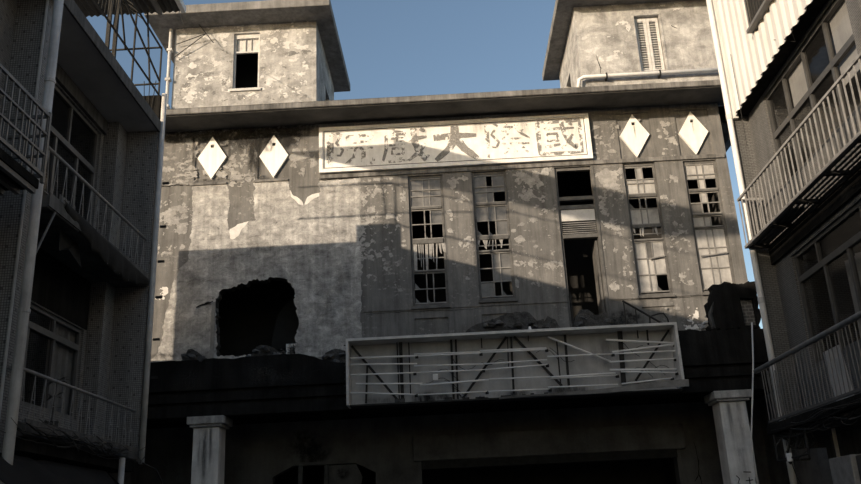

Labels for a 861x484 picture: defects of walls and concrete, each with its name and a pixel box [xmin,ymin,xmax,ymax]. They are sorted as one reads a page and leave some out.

peeling [174,22,309,103]
damp [164,125,313,178]
peeling [657,121,678,156]
spalling [151,130,407,362]
peeling [507,167,563,288]
peeling [592,121,636,292]
peeling [659,175,691,256]